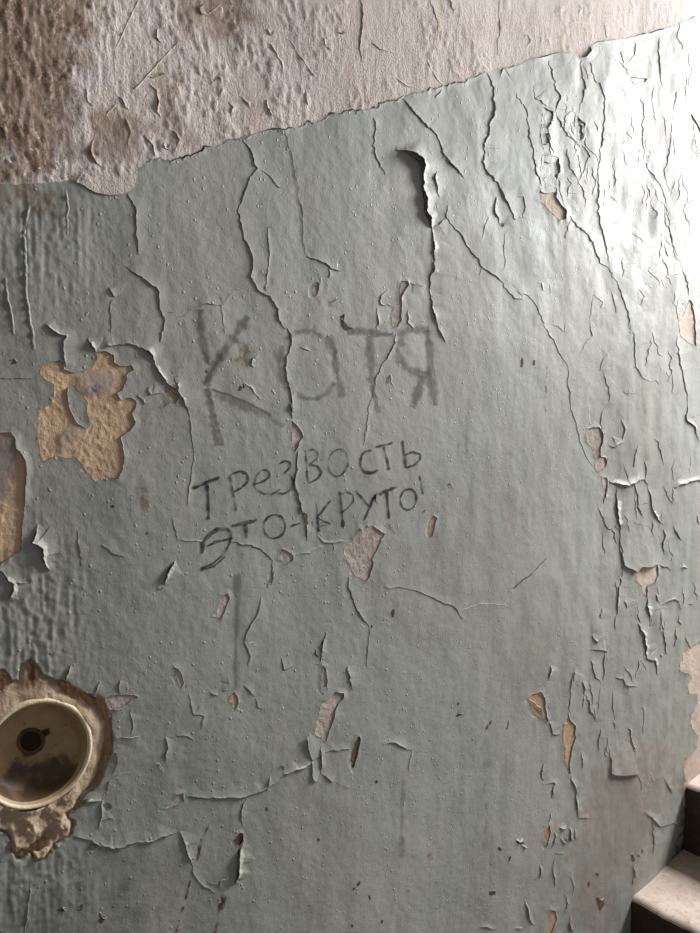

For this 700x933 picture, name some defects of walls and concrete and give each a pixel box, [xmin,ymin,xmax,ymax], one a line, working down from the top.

peeling [0,319,183,603]
crack [69,680,350,894]
crack [165,450,343,763]
peeling [307,660,350,782]
peeling [339,520,396,585]
crack [99,0,700,542]
crack [347,576,508,690]
crack [540,763,589,818]
peeling [483,11,700,351]
peeling [524,419,700,817]
crack [632,809,684,884]
peeling [645,331,684,394]